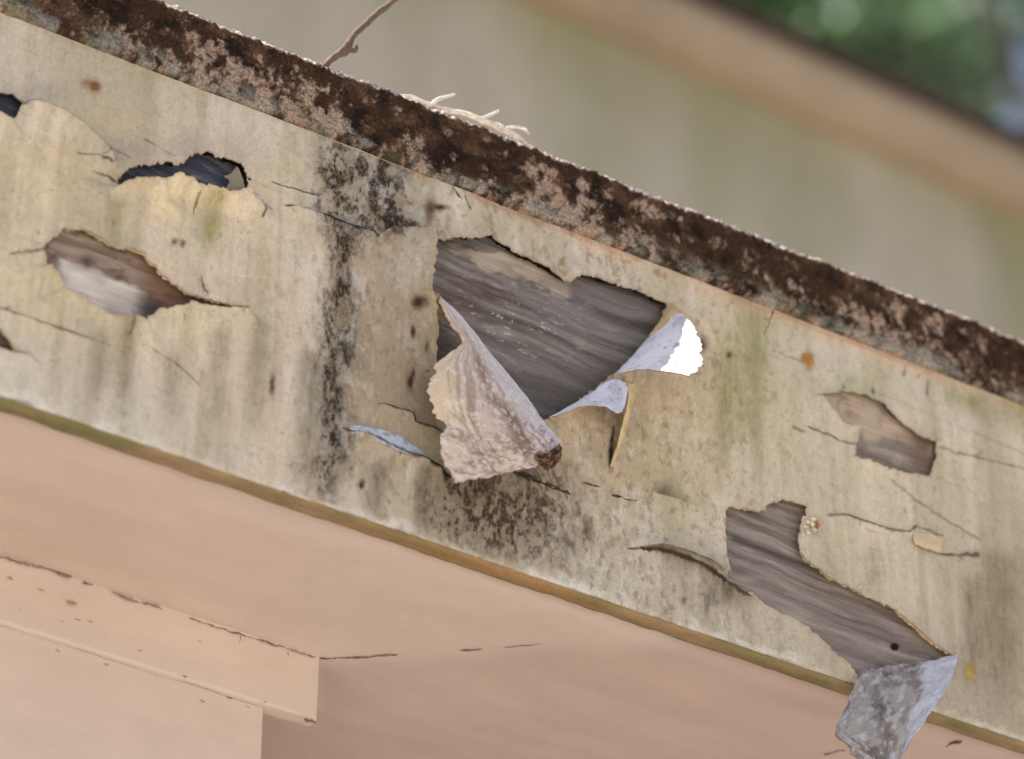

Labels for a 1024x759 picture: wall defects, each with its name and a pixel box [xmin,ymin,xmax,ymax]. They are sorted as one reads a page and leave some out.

peeling [118,153,248,191]
crack [262,179,379,235]
peeling [45,229,231,319]
leakage [314,143,416,493]
peeling [426,237,703,483]
crack [343,428,451,478]
crack [513,427,637,501]
peeling [823,391,936,476]
leakage [431,473,565,553]
crack [0,556,162,609]
crack [190,617,397,659]
peeling [725,500,958,759]